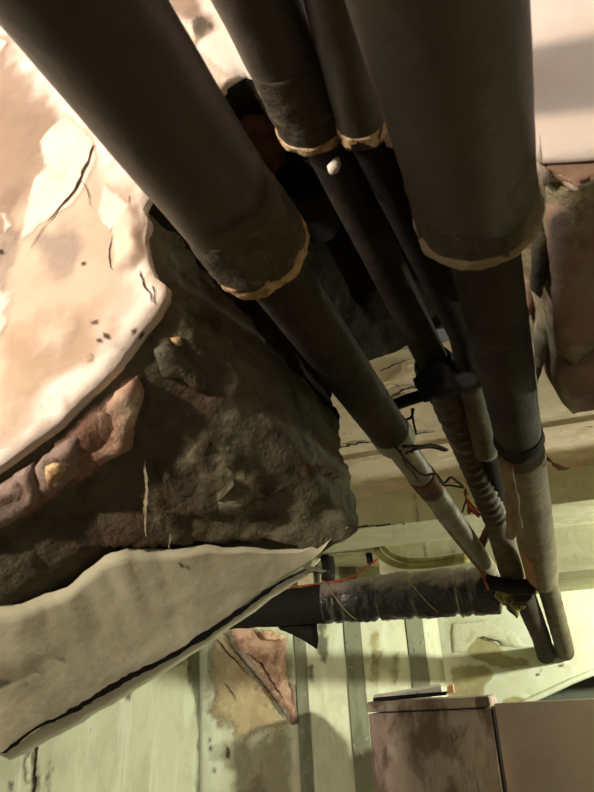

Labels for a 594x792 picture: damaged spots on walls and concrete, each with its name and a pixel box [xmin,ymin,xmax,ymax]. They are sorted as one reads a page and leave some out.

crack [30,144,94,249]
spalling [537,160,594,187]
spalling [0,213,358,606]
crack [2,569,307,792]
damp [188,652,200,716]
spalling [208,628,298,738]